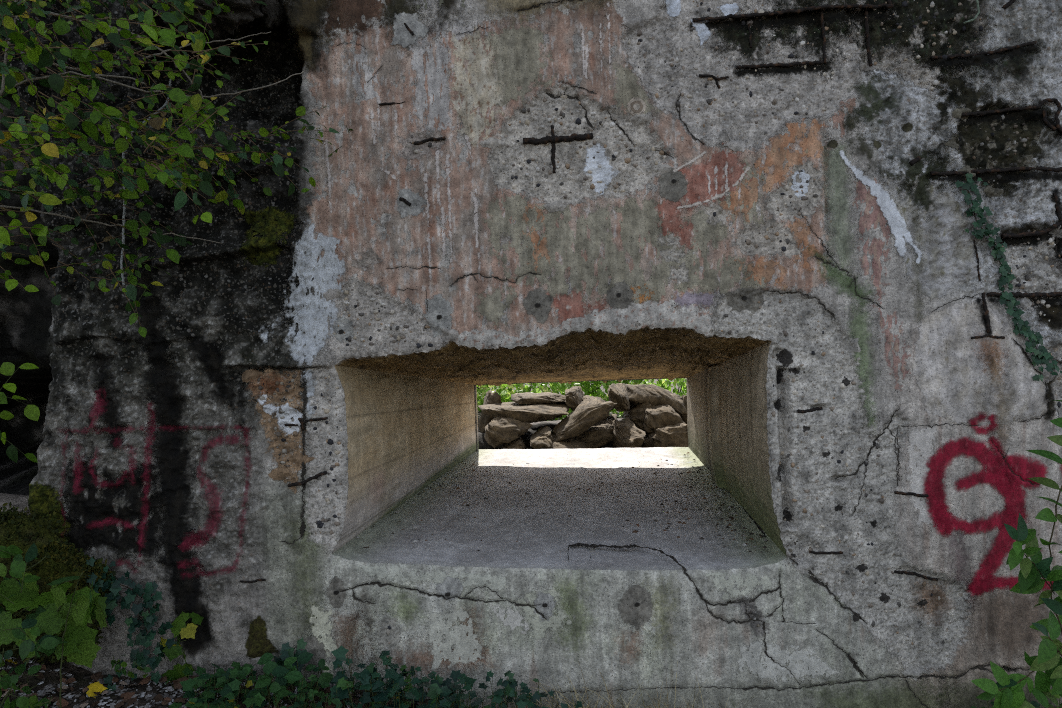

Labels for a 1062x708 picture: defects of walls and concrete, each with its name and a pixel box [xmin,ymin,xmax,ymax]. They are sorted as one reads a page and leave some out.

corrosion [692,0,894,89]
corrosion [523,125,593,173]
water stain [689,0,1062,277]
efflorescence [258,220,346,435]
spalling [242,0,991,684]
corrosion [971,240,1062,339]
spalling [993,222,1062,324]
spalling [1042,341,1062,418]
water stain [64,262,212,656]
crack [835,407,1039,516]
crack [340,582,547,620]
crack [544,542,1030,708]